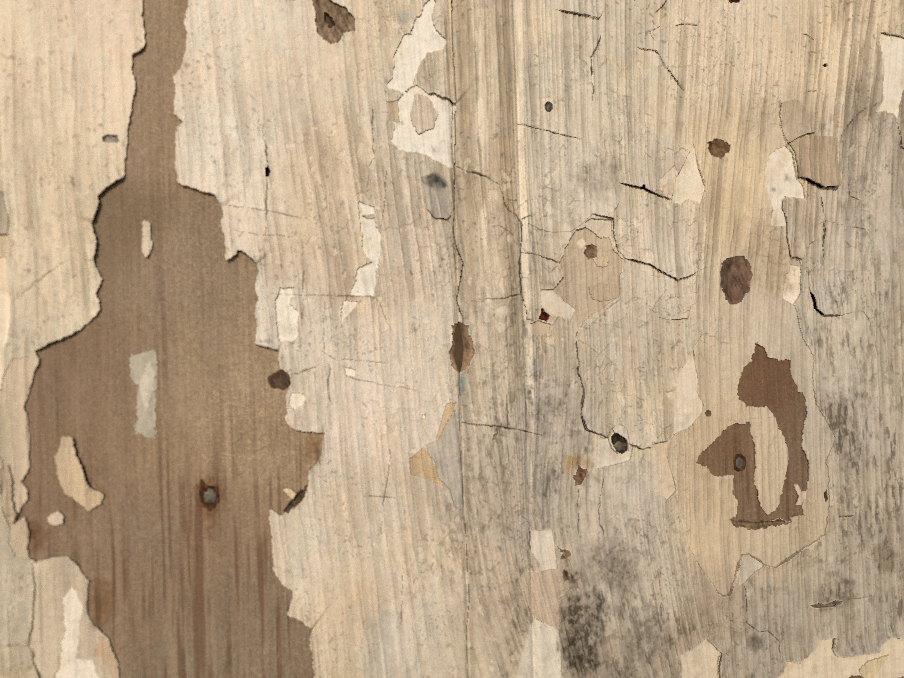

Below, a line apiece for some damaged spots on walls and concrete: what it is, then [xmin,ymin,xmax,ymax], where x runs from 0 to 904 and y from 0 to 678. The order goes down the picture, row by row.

spalling [312,0,355,44]
peeling [386,0,456,168]
crack [517,124,578,139]
crack [557,9,603,100]
crack [637,0,697,91]
peeling [340,201,382,329]
crack [456,166,560,322]
peeling [0,0,325,678]
crack [576,299,642,449]
peeling [523,85,892,595]
damp [551,535,688,678]
crack [689,534,825,658]